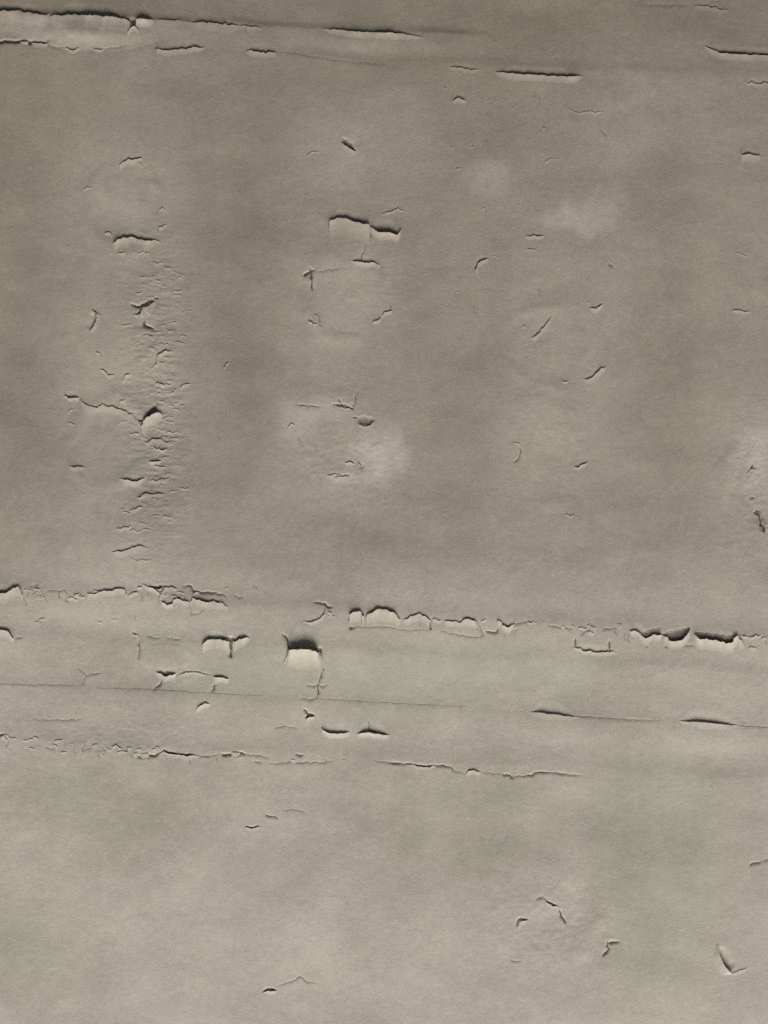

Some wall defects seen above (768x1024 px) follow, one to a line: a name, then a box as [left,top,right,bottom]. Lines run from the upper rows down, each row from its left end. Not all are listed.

peeling [0,10,264,56]
peeling [315,218,401,273]
crack [131,297,158,329]
crack [64,396,141,429]
peeling [0,584,245,615]
peeling [301,602,536,638]
peeling [202,637,250,657]
peeling [615,624,768,655]
crack [0,719,76,750]
crack [87,745,326,765]
crack [375,760,578,778]
crack [517,897,566,929]